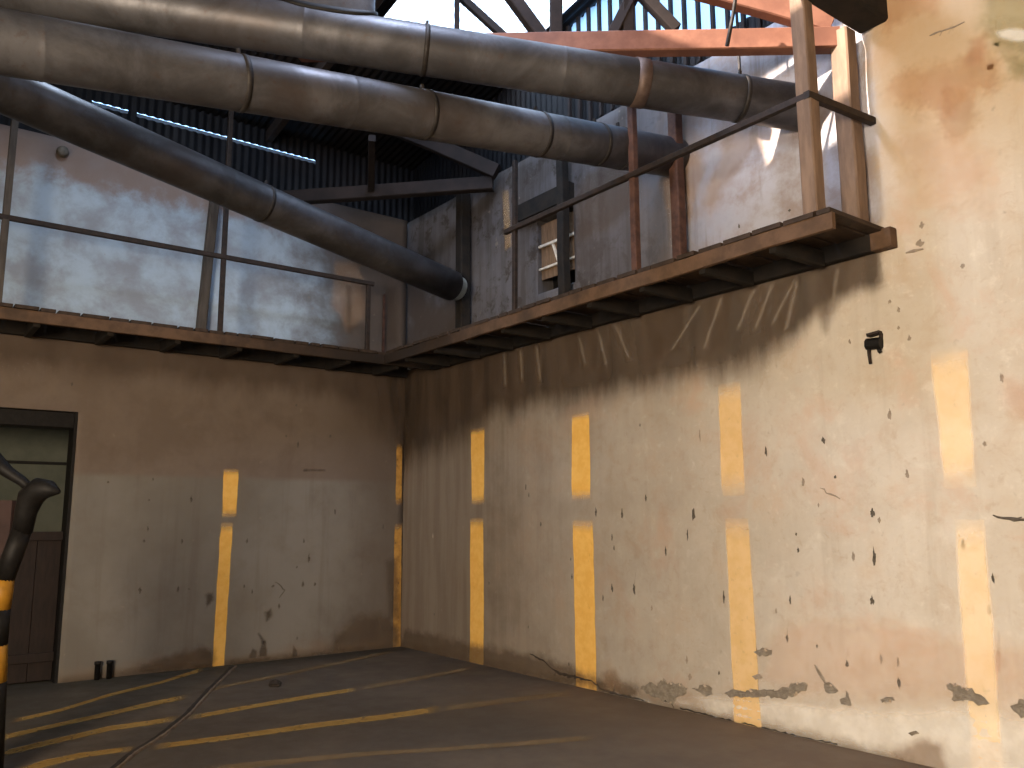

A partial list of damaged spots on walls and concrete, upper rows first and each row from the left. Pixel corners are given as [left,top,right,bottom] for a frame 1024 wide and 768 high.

spalling [754,648,772,657]
spalling [640,656,808,705]
crack [530,654,837,745]
spalling [946,683,990,706]
spalling [1010,699,1024,718]